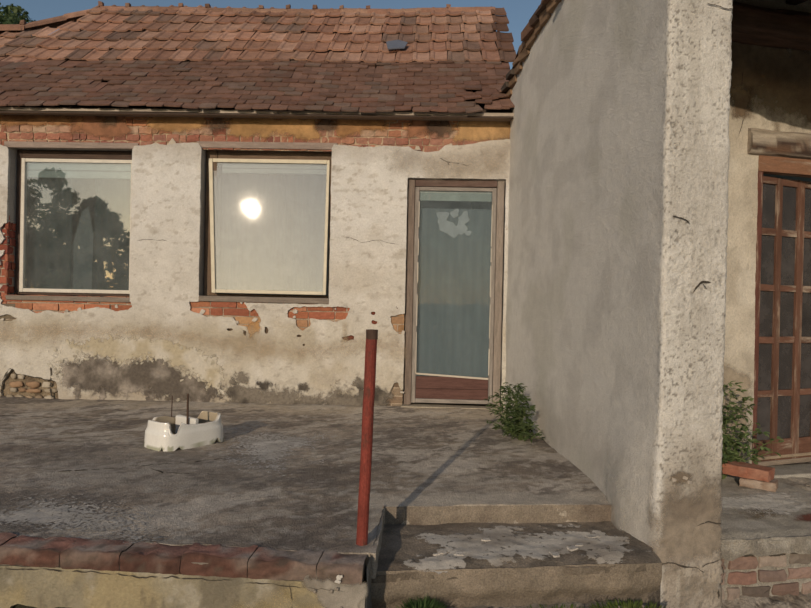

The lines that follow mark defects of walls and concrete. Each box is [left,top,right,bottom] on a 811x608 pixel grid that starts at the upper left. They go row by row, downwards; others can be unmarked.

water stain [730,42,811,123]
spalling [0,115,510,152]
spalling [0,215,132,321]
spalling [190,301,268,335]
spalling [283,303,350,346]
spalling [391,306,405,335]
water stain [61,355,364,406]
water stain [374,386,393,406]
peeling [403,523,651,574]
crack [8,569,225,581]
crack [252,582,349,599]